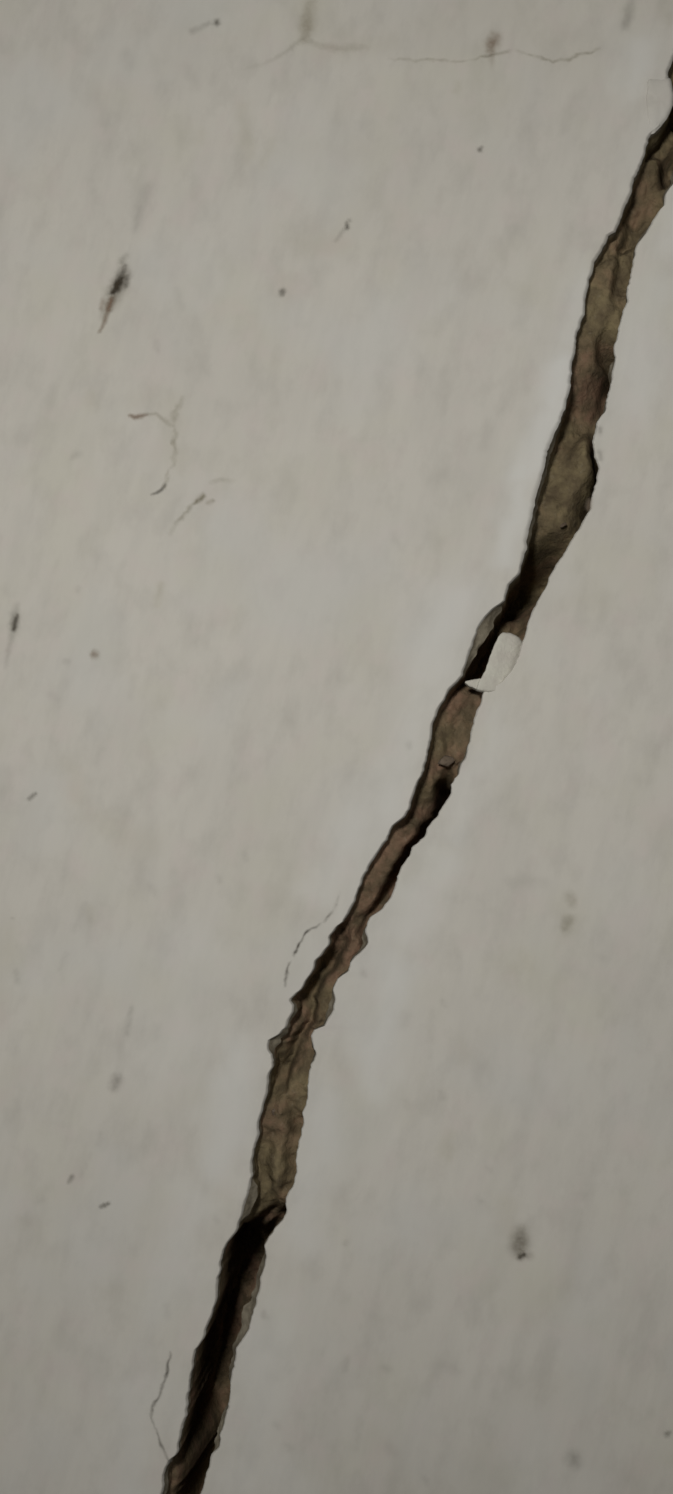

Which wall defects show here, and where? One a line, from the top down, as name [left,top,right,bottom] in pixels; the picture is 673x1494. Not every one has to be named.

crack [156,61,673,1494]